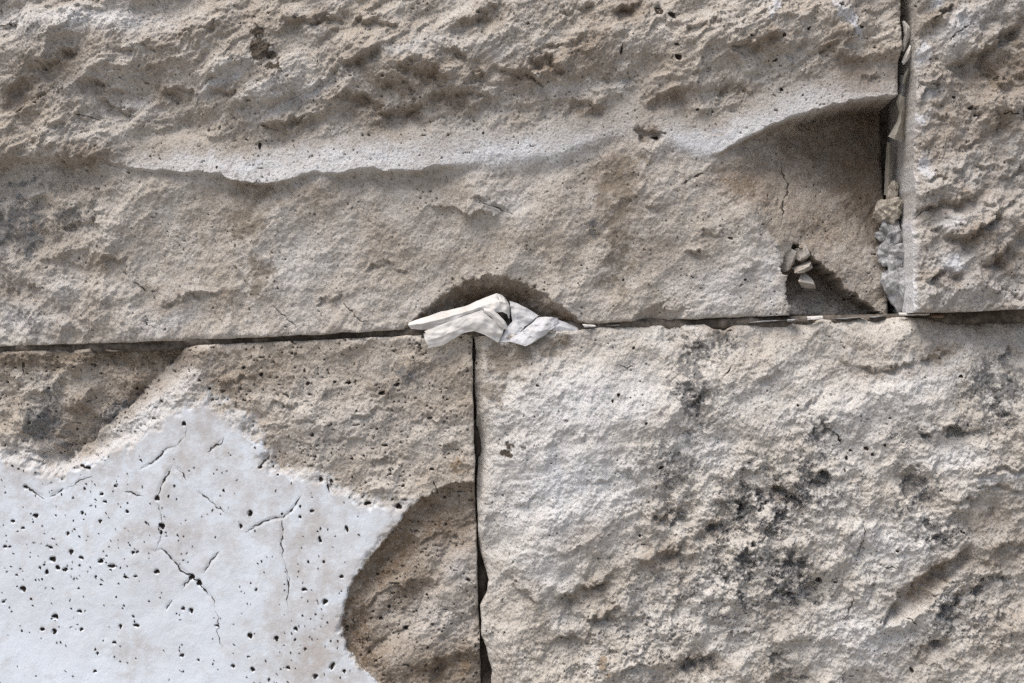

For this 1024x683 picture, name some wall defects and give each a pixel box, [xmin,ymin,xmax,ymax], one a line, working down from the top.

crack [780,161,789,221]
spalling [694,99,892,323]
crack [27,476,92,499]
crack [125,428,300,646]